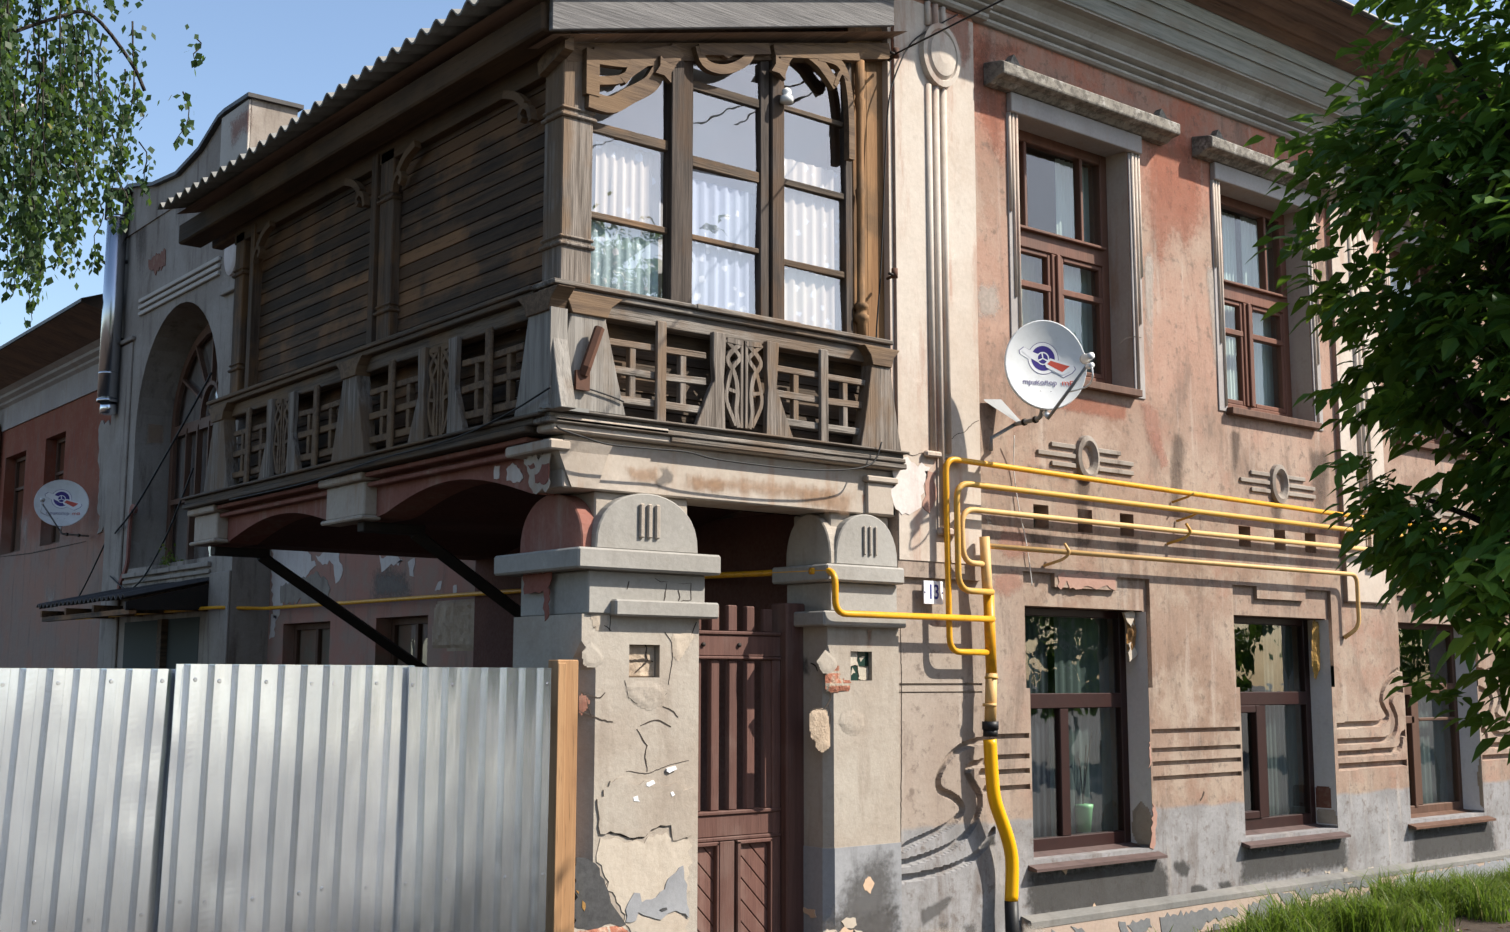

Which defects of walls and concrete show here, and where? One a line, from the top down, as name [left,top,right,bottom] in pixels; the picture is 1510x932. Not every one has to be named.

peeling [494,454,551,494]
peeling [891,456,938,515]
peeling [269,550,343,639]
crack [579,682,688,774]
spalling [810,666,851,752]
flaking render [574,777,695,932]